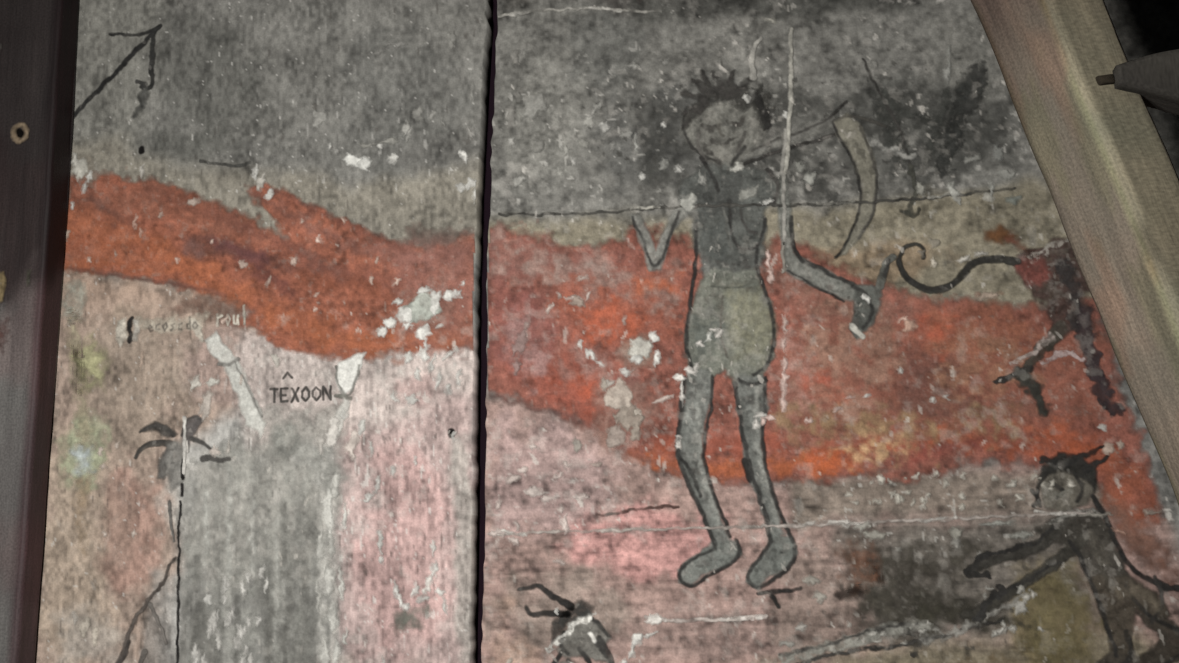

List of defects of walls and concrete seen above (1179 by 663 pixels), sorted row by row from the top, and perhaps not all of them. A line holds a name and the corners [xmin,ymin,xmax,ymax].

peeling [378,281,465,394]
peeling [546,292,590,313]
peeling [578,332,698,447]
crack [478,0,1088,663]